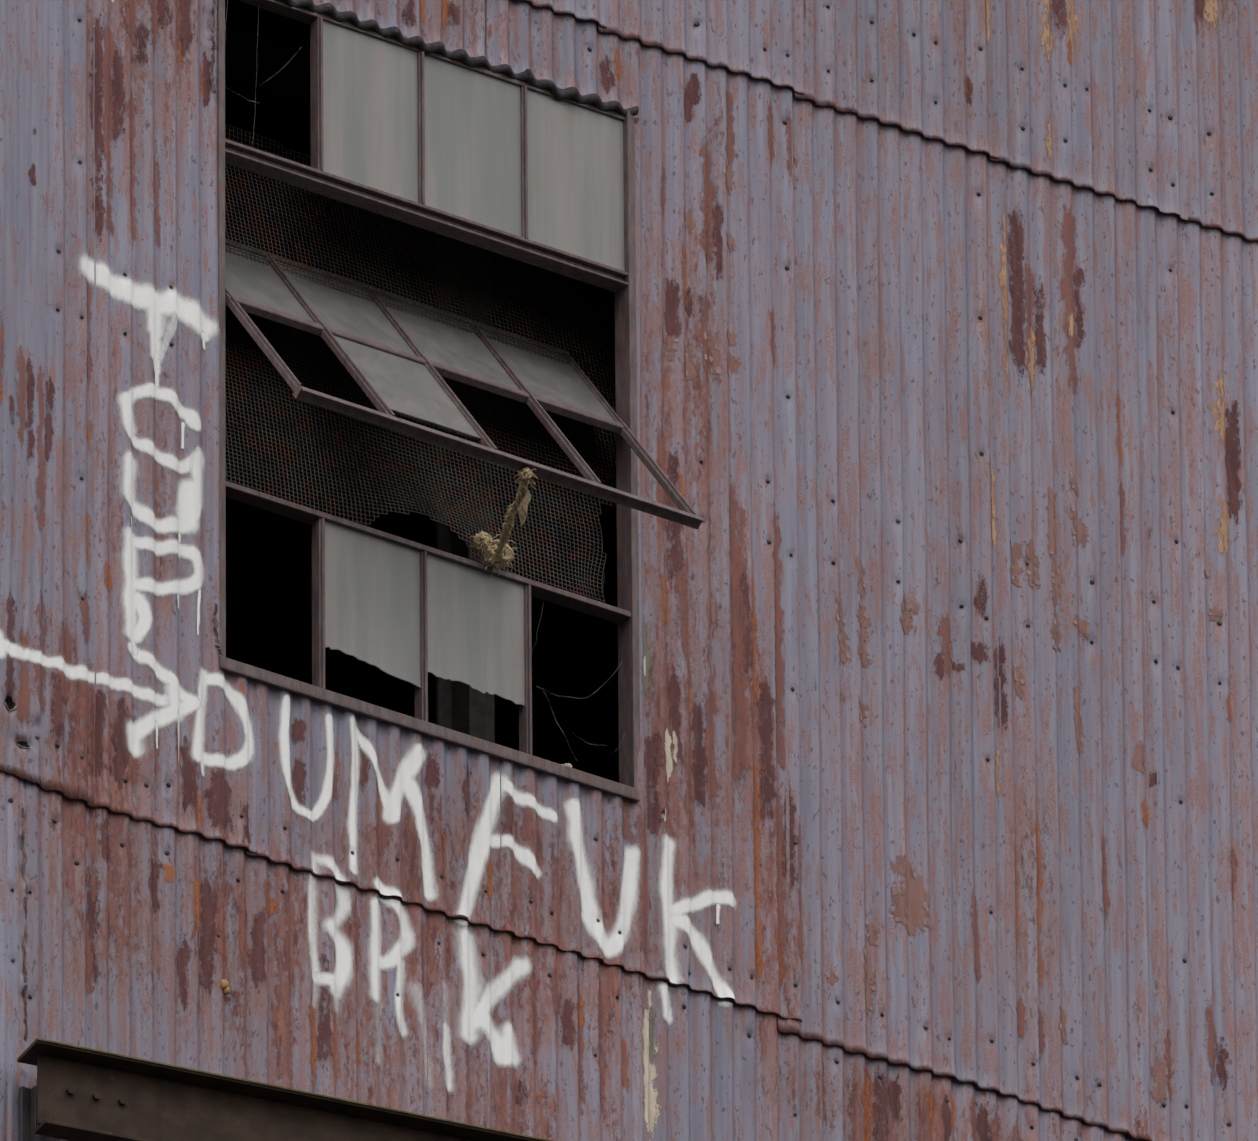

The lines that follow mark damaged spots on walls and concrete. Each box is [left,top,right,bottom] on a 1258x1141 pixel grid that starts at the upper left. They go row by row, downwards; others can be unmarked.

rust [699,84,738,280]
rust [998,202,1048,394]
rust [1058,204,1085,395]
peeling [1010,471,1091,652]
rust [180,735,251,843]
rust [177,868,277,1010]
rust [291,759,307,807]
rust [358,729,393,855]
rust [620,736,662,964]
rust [656,424,804,993]
peeling [889,855,933,944]
peeling [1073,686,1085,756]